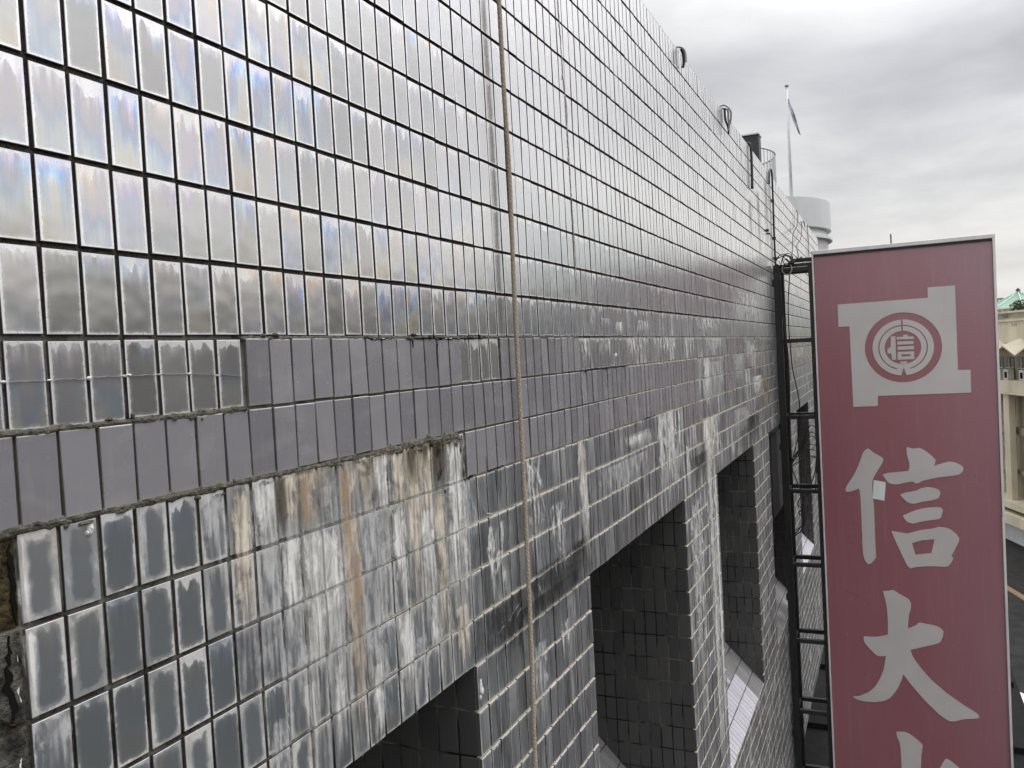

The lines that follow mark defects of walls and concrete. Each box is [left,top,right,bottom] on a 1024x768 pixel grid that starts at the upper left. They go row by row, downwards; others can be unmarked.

leakage [658,319,723,400]
corrosion [299,473,315,516]
leakage [526,461,542,523]
leakage [578,442,589,525]
leakage [604,410,689,486]
corrosion [340,470,365,661]
leakage [488,522,505,583]
leakage [691,417,726,735]
spalling [0,538,30,768]
leakage [536,641,548,696]